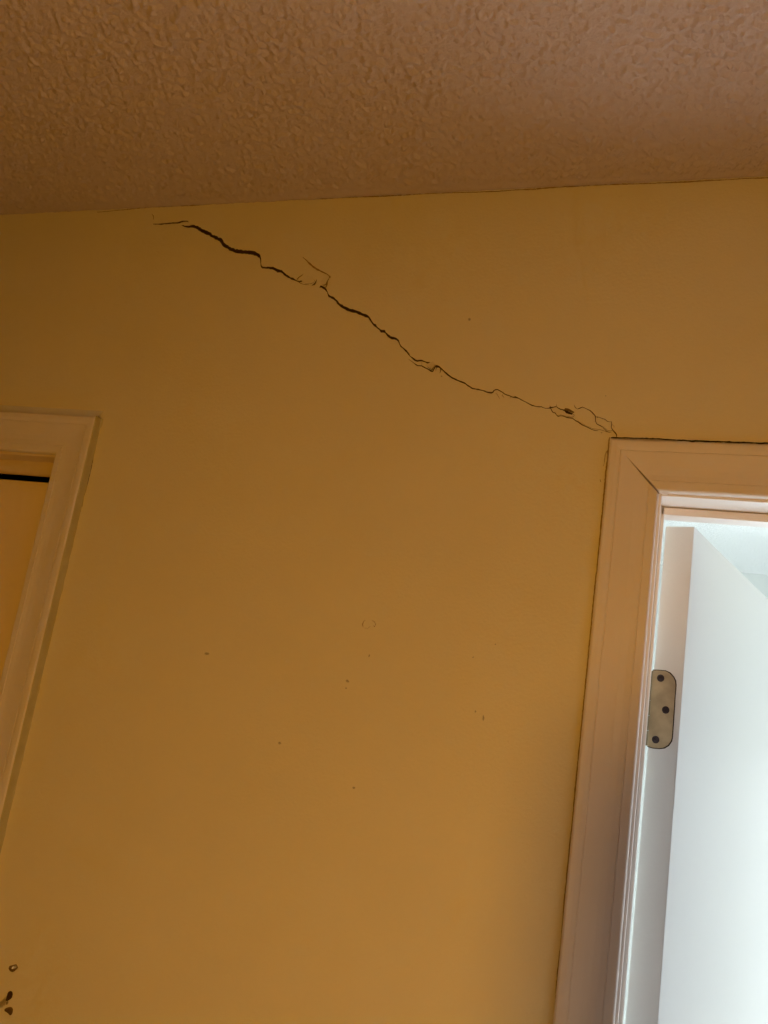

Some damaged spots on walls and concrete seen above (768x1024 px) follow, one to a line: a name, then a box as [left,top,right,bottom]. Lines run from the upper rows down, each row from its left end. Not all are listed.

crack [322,177,768,199]
crack [103,204,768,996]